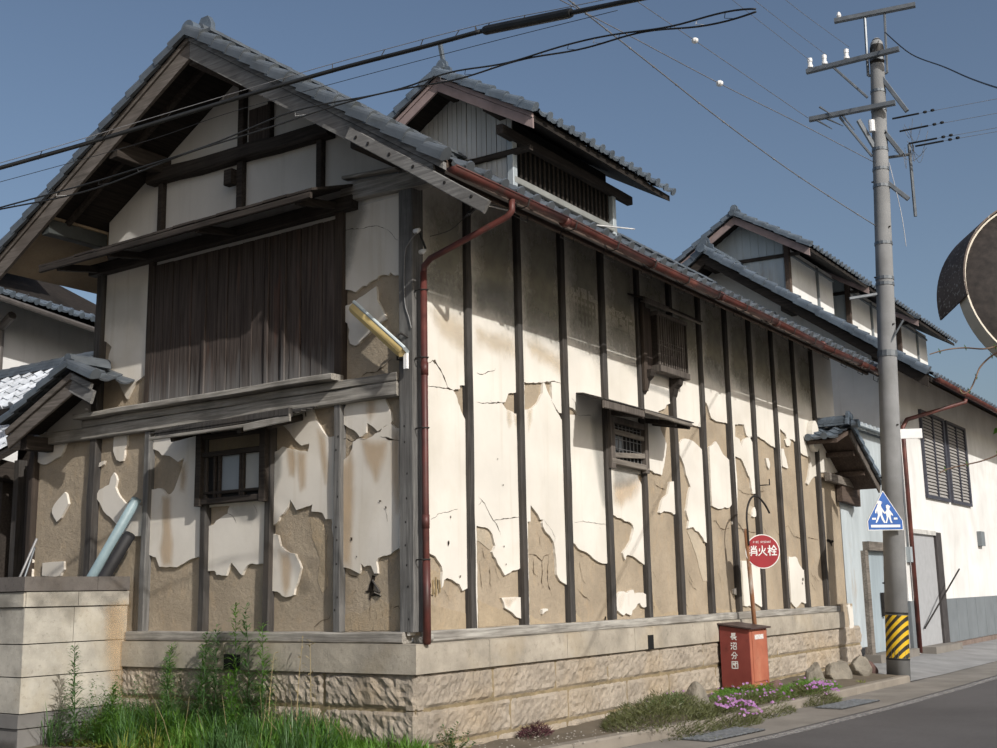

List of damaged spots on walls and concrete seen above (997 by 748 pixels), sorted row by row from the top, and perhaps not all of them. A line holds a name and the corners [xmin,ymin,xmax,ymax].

spalling [345,274,399,380]
damp [428,208,463,290]
damp [478,219,514,310]
damp [526,232,559,321]
damp [571,245,634,344]
damp [677,291,792,393]
spalling [305,397,399,458]
spalling [34,433,333,632]
spalling [477,404,854,628]
spalling [345,549,400,632]
spalling [415,555,466,635]